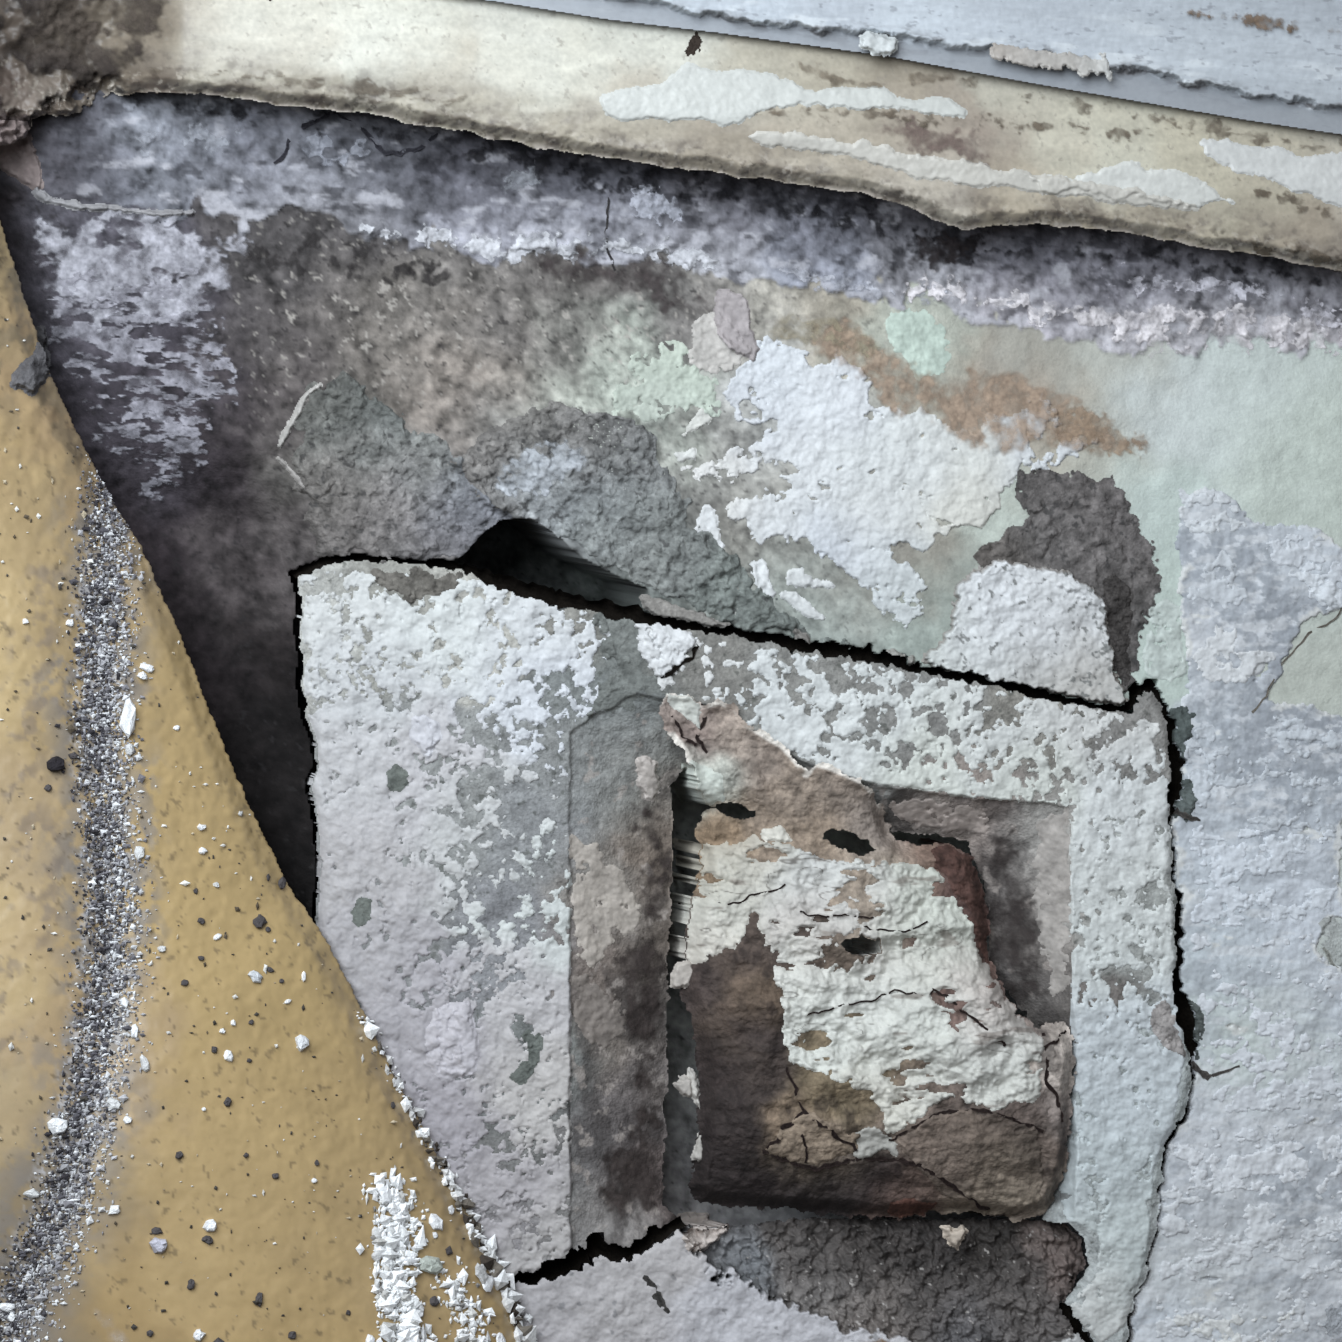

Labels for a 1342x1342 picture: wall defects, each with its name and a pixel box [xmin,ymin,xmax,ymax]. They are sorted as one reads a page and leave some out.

leakage [303,113,402,166]
peeling [599,30,1235,211]
peeling [1199,138,1342,207]
leakage [34,210,317,500]
leakage [331,165,738,313]
leakage [848,228,1342,356]
peeling [276,289,1342,1342]
crack [292,553,1240,1210]
leakage [599,1107,662,1213]
crack [514,1216,686,1314]
crack [1059,1301,1092,1342]
crack [1126,1231,1157,1342]